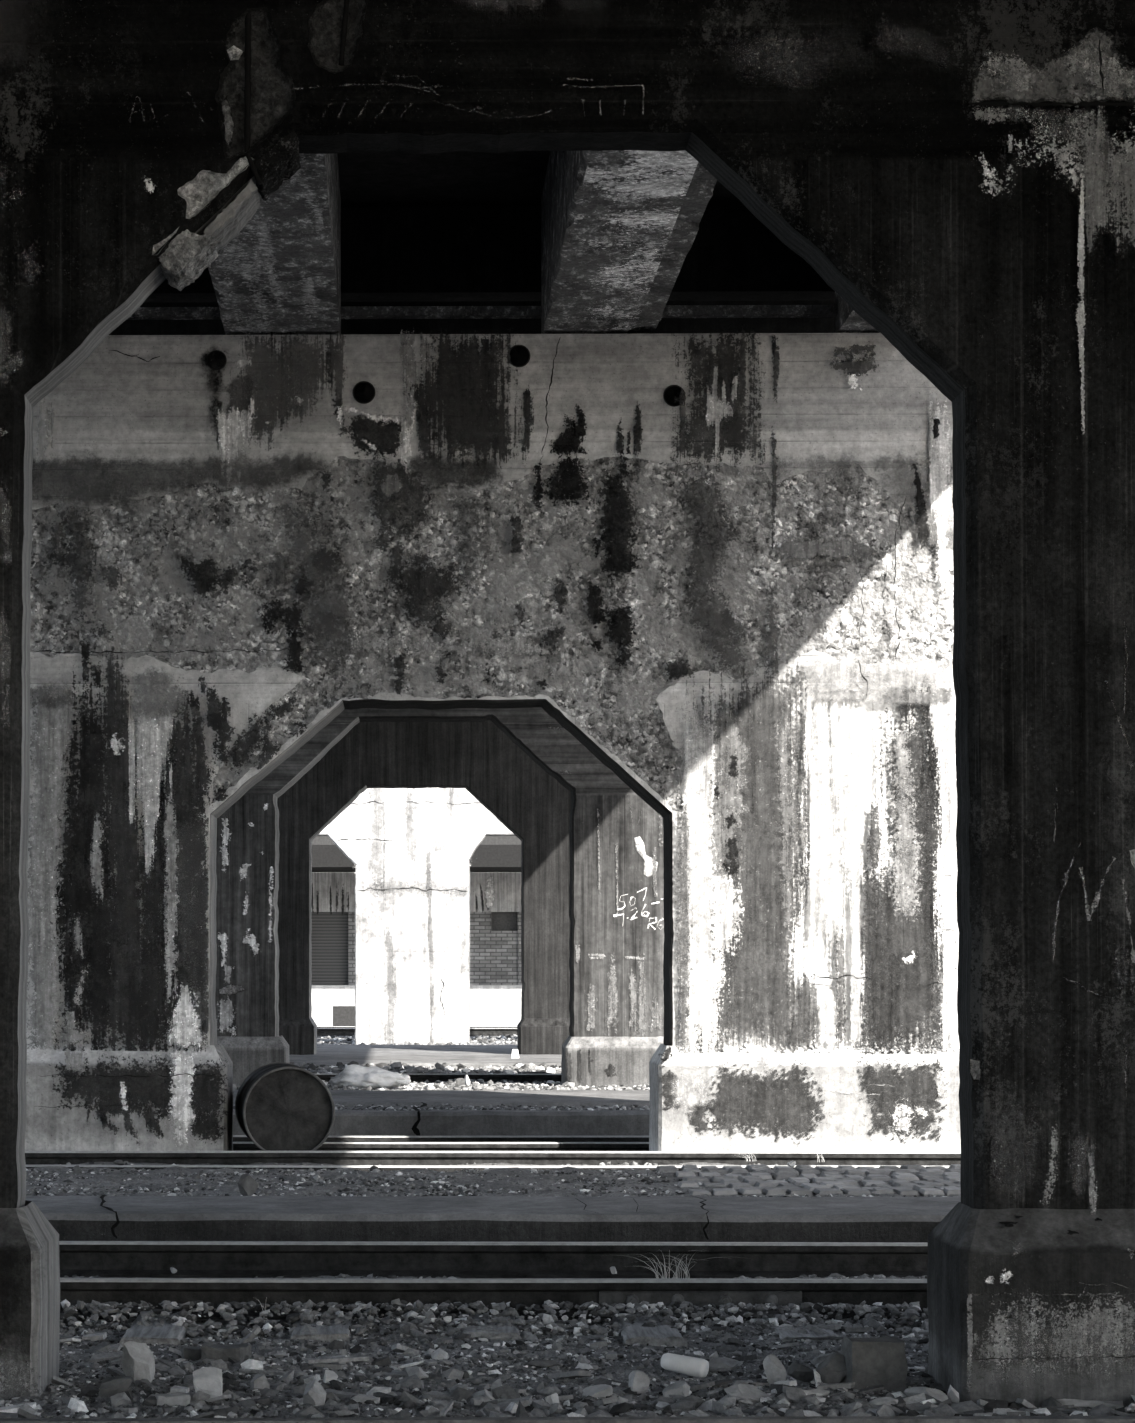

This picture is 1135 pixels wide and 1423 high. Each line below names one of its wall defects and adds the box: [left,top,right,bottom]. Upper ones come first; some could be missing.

spalling [152,7,324,331]
peeling [559,150,698,330]
spalling [969,27,1135,107]
water stain [972,38,1135,434]
peeling [0,482,12,565]
spalling [30,456,954,813]
water stain [808,391,953,601]
water stain [26,639,104,1072]
water stain [86,671,274,1146]
water stain [773,656,959,1055]
crack [100,1195,120,1239]
crack [692,1196,709,1240]